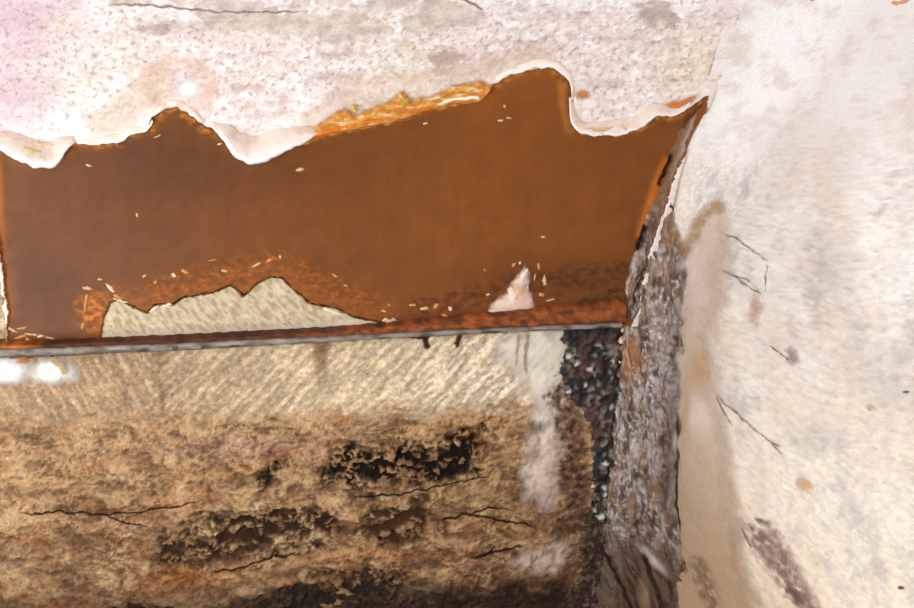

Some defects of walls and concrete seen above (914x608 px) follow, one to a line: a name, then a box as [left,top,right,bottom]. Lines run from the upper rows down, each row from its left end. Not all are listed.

flaking render [491,59,691,137]
flaking render [0,99,317,169]
rust [0,67,709,364]
spalling [102,275,400,337]
water stain [498,101,814,608]
crack [27,502,191,527]
crack [359,477,484,498]
crack [439,506,531,559]